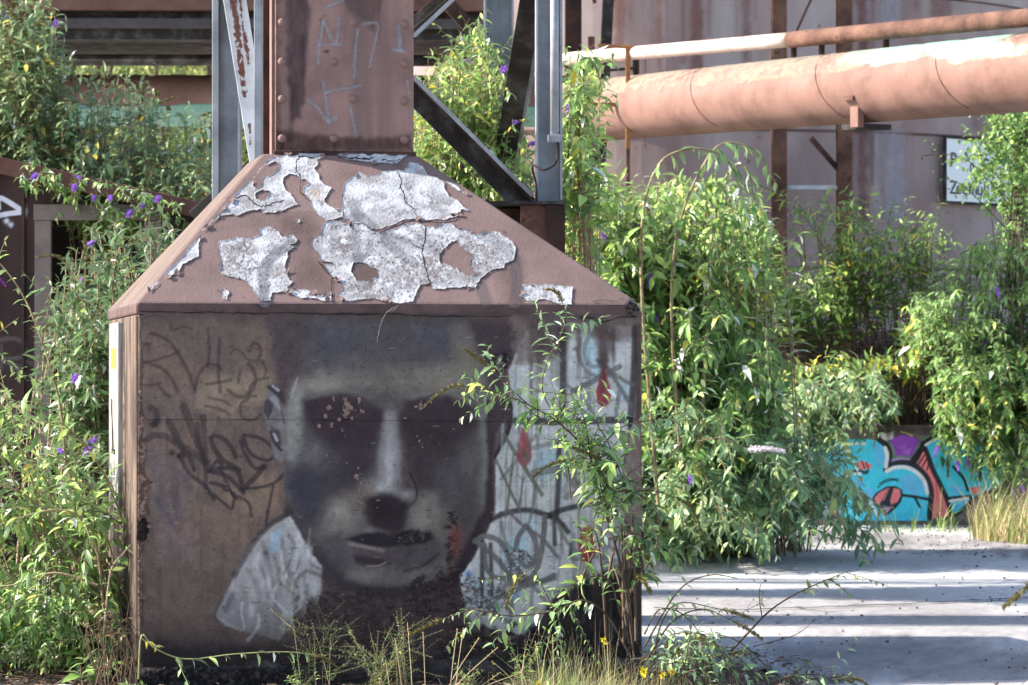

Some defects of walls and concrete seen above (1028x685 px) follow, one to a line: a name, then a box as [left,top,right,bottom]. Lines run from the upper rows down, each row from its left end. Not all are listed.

corrosion [287,0,308,117]
corrosion [277,131,410,151]
peeling [147,150,516,303]
peeling [519,284,573,305]